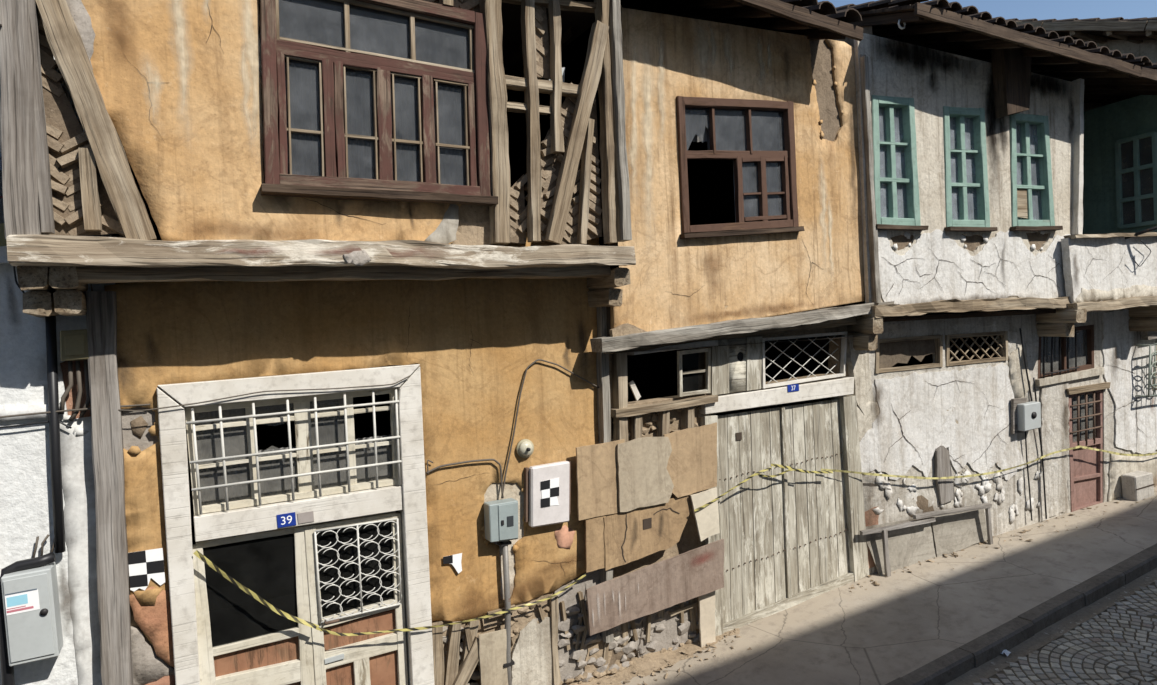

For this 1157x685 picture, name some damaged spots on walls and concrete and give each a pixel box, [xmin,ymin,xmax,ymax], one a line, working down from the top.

spalling [809,39,844,141]
spalling [891,232,915,251]
spalling [960,234,988,252]
crack [883,243,1126,296]
spalling [1026,231,1048,251]
spalling [121,406,159,455]
crack [884,404,923,464]
crack [926,380,1011,483]
peeling [129,586,175,685]
spalling [584,639,632,678]